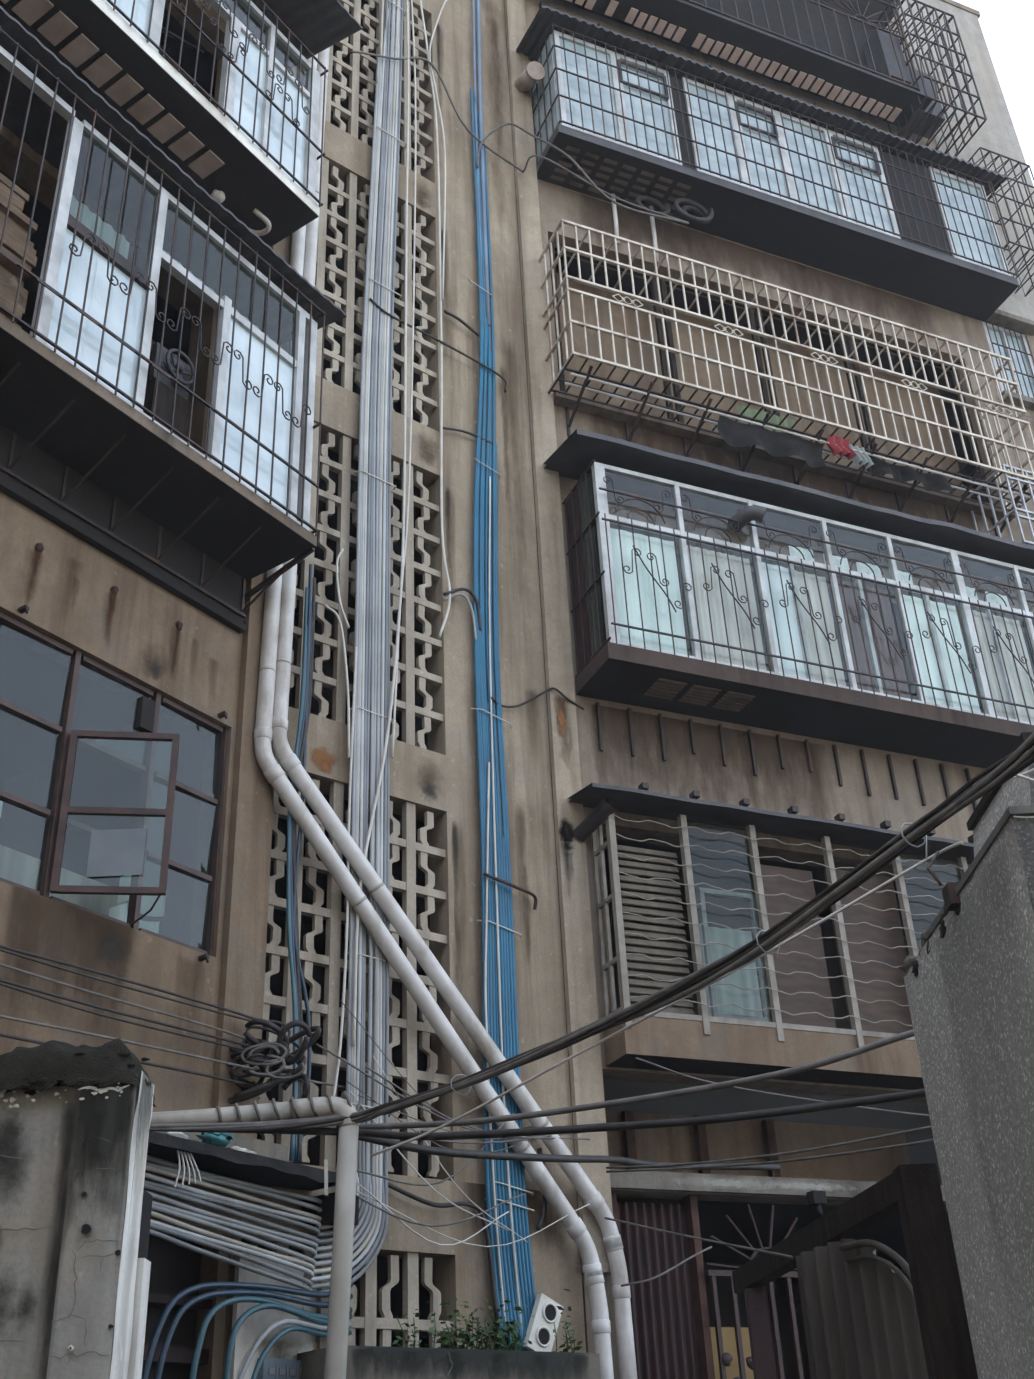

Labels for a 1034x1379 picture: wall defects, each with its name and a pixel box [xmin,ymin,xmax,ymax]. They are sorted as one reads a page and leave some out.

corrosion [31,543,44,585]
corrosion [108,586,119,622]
corrosion [556,698,566,734]
corrosion [312,749,334,772]
peeling [0,1083,130,1108]
leakage [0,1072,154,1348]